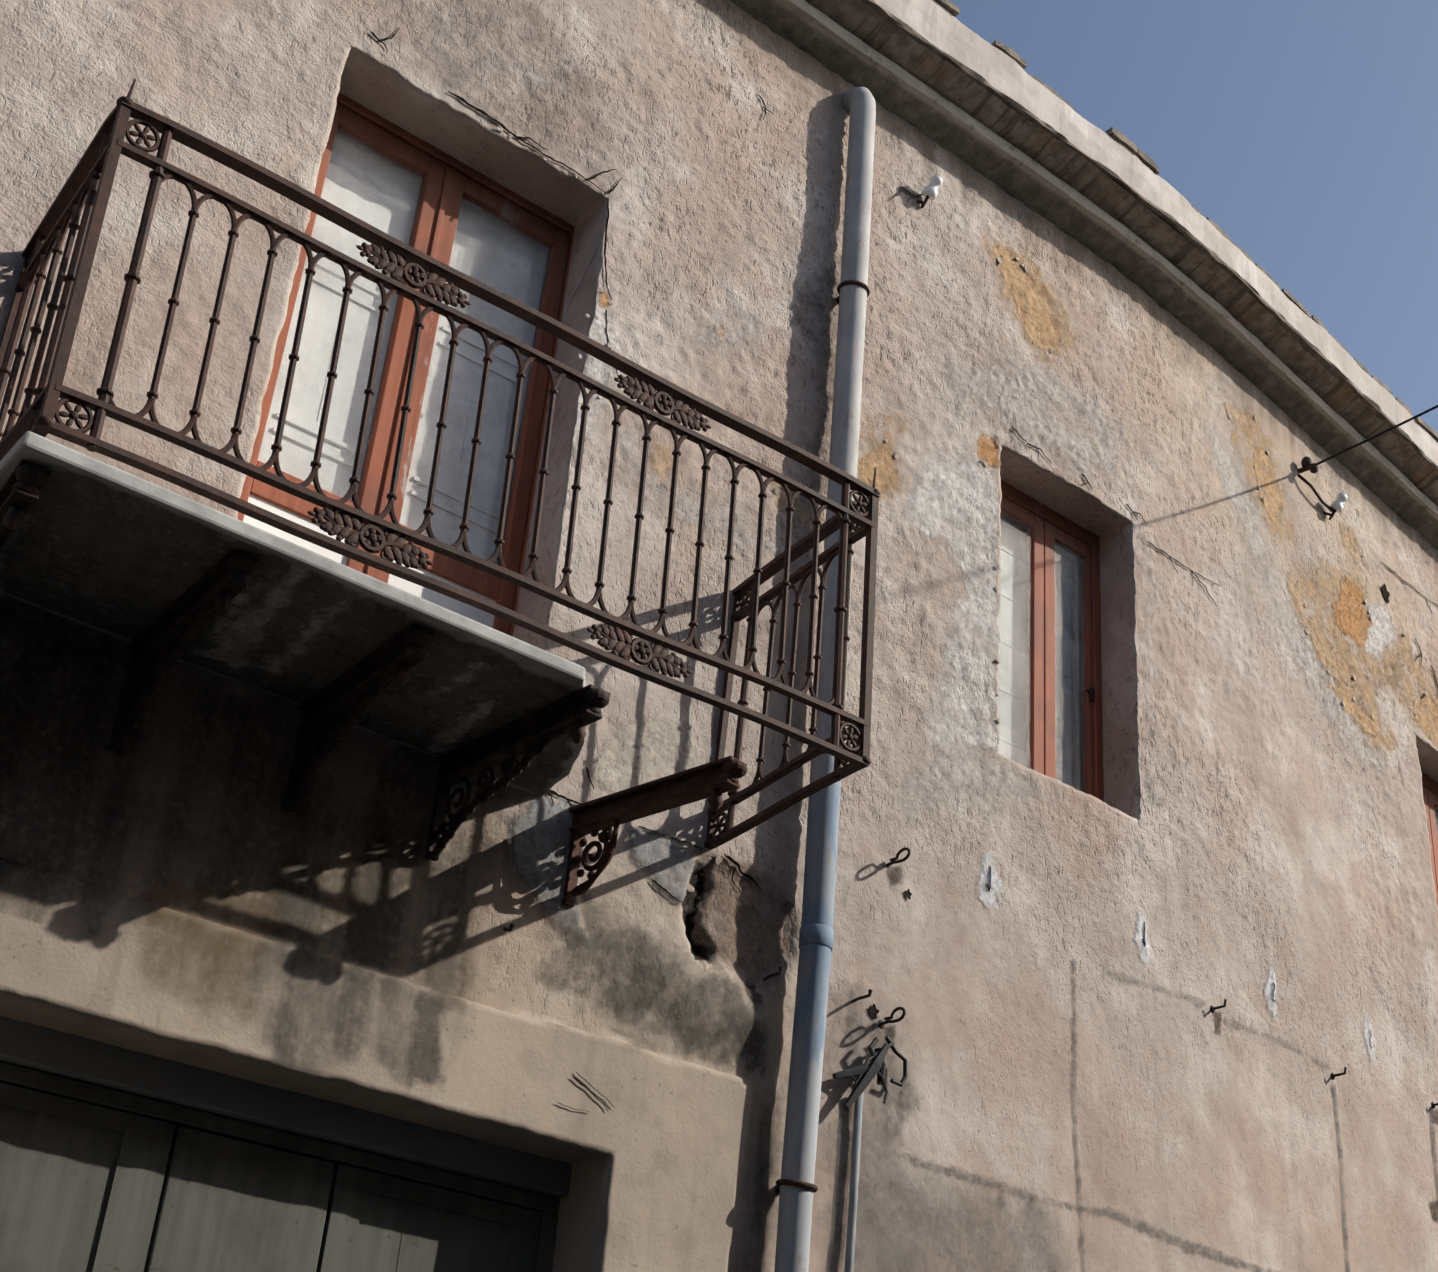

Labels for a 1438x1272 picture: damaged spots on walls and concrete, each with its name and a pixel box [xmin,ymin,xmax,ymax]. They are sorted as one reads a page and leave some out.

crack [448,91,623,375]
flaking render [994,246,1061,354]
flaking render [1288,578,1380,737]
crack [1381,562,1438,687]
water stain [0,468,574,1068]
flaking render [681,855,792,994]